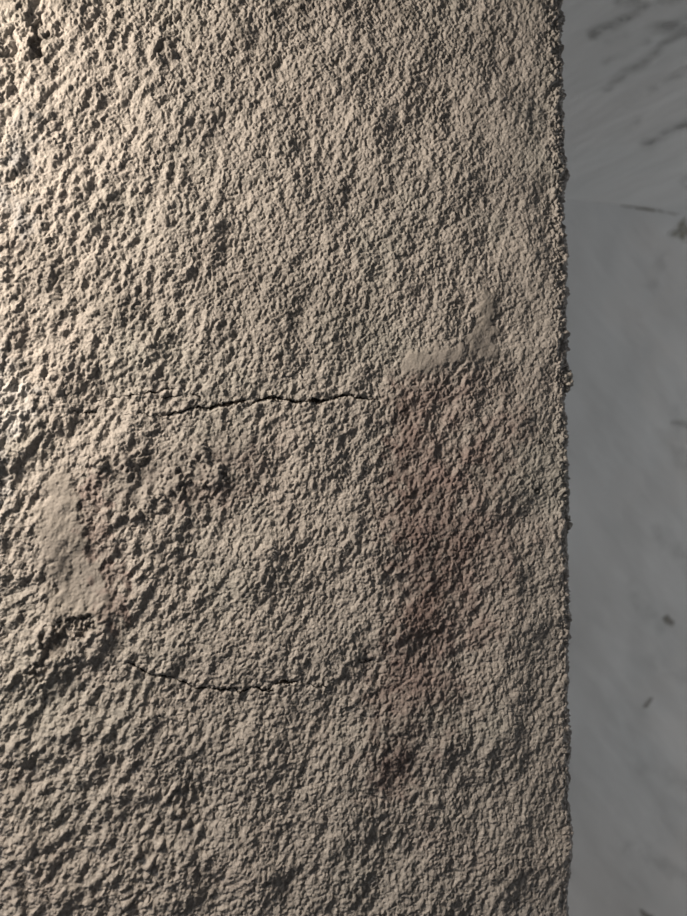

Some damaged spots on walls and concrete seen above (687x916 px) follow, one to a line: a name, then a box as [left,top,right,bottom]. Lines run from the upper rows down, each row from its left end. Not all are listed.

crack [73,388,378,417]
crack [128,662,327,694]